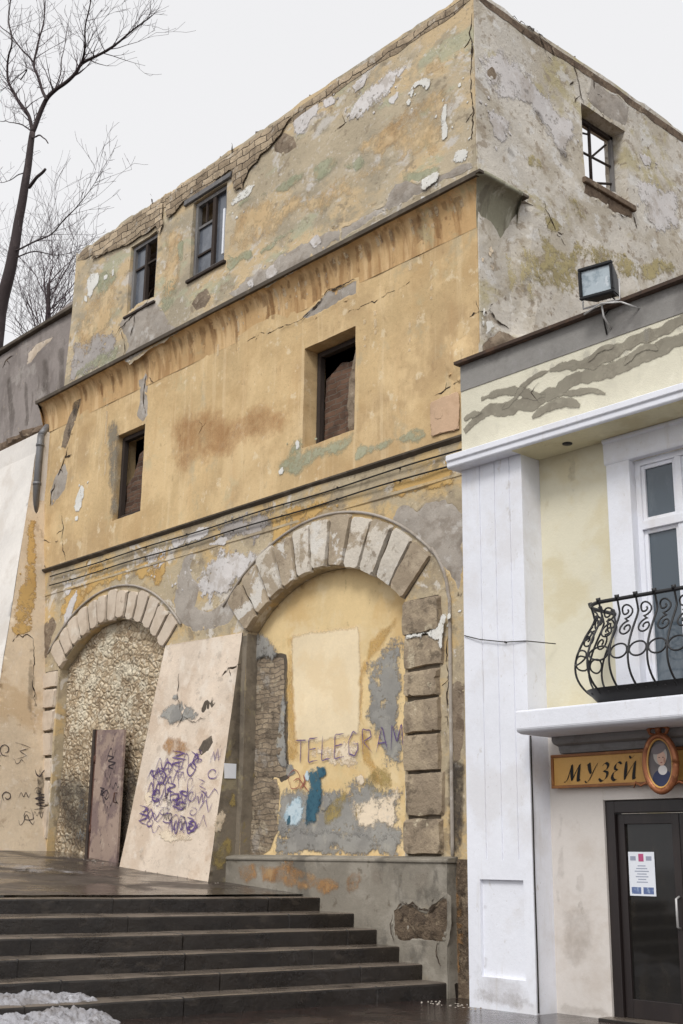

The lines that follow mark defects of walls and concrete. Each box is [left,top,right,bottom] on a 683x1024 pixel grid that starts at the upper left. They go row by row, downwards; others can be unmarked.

crack [464,15,475,140]
peeling [466,49,579,165]
flaking render [70,66,477,380]
crack [248,279,354,341]
spalling [49,405,88,521]
peeling [278,428,425,475]
spalling [12,501,338,661]
spalling [176,658,218,759]
peeling [305,742,390,786]
spalling [389,892,451,947]